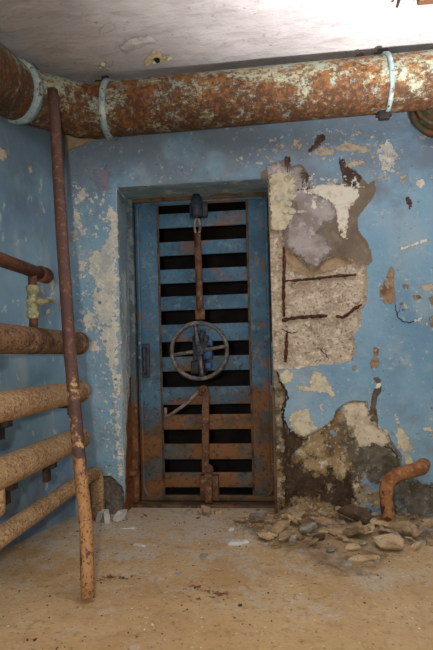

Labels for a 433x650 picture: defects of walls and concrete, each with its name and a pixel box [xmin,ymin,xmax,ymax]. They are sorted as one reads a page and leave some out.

spalling [144,50,173,66]
peeling [69,185,131,515]
spalling [236,128,425,514]
peeling [380,267,433,331]
crack [395,305,422,324]
leakage [278,424,400,509]
leakage [395,480,433,515]